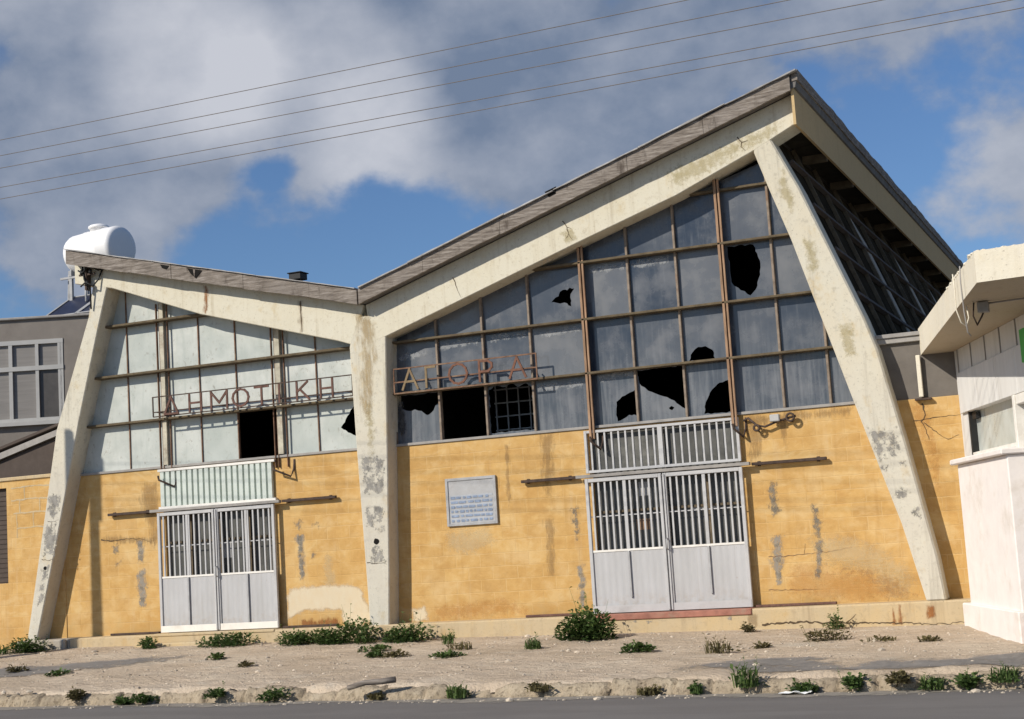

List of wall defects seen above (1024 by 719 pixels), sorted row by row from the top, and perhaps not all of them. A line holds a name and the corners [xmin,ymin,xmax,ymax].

crack [914,403,957,439]
peeling [867,426,906,471]
peeling [361,456,386,563]
peeling [36,493,60,605]
damp [286,585,370,625]